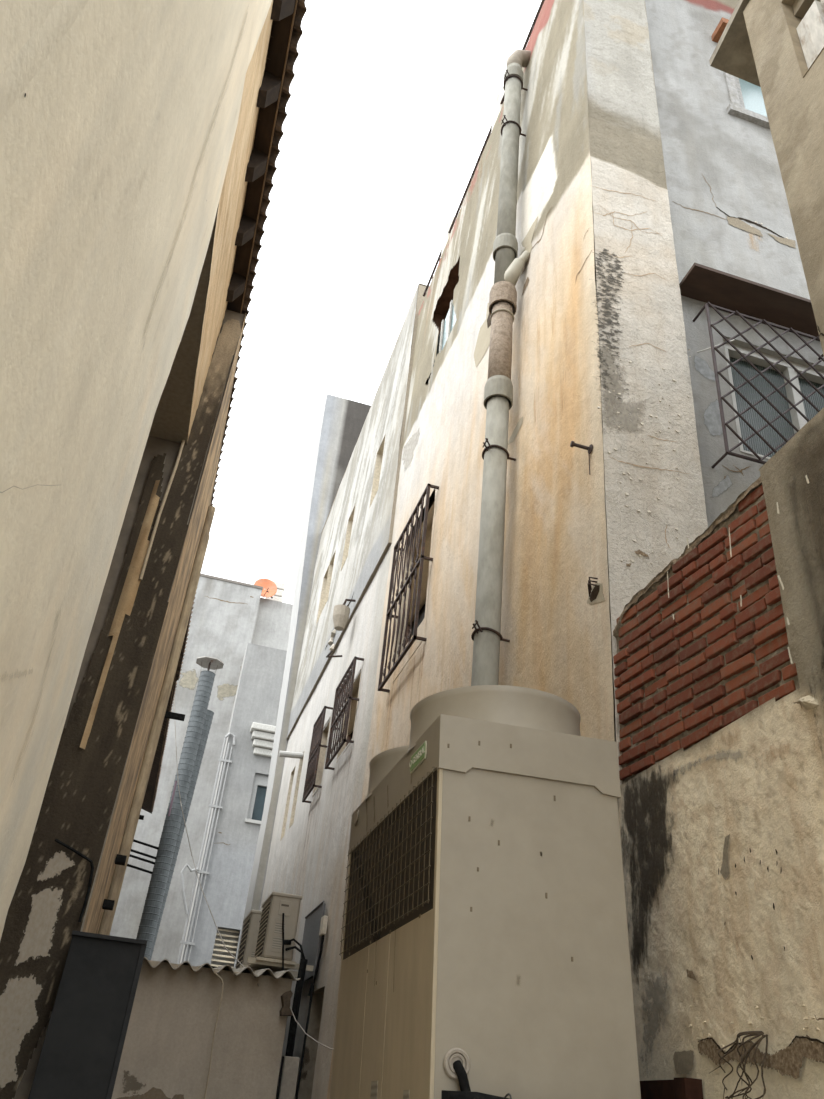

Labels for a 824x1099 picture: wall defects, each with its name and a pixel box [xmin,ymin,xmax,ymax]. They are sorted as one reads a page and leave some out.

crack [575,176,796,283]
mould [591,247,644,432]
crack [611,457,689,474]
leakage [794,437,824,568]
peeling [0,851,75,1090]
leakage [621,751,741,1061]
spalling [673,1004,824,1079]